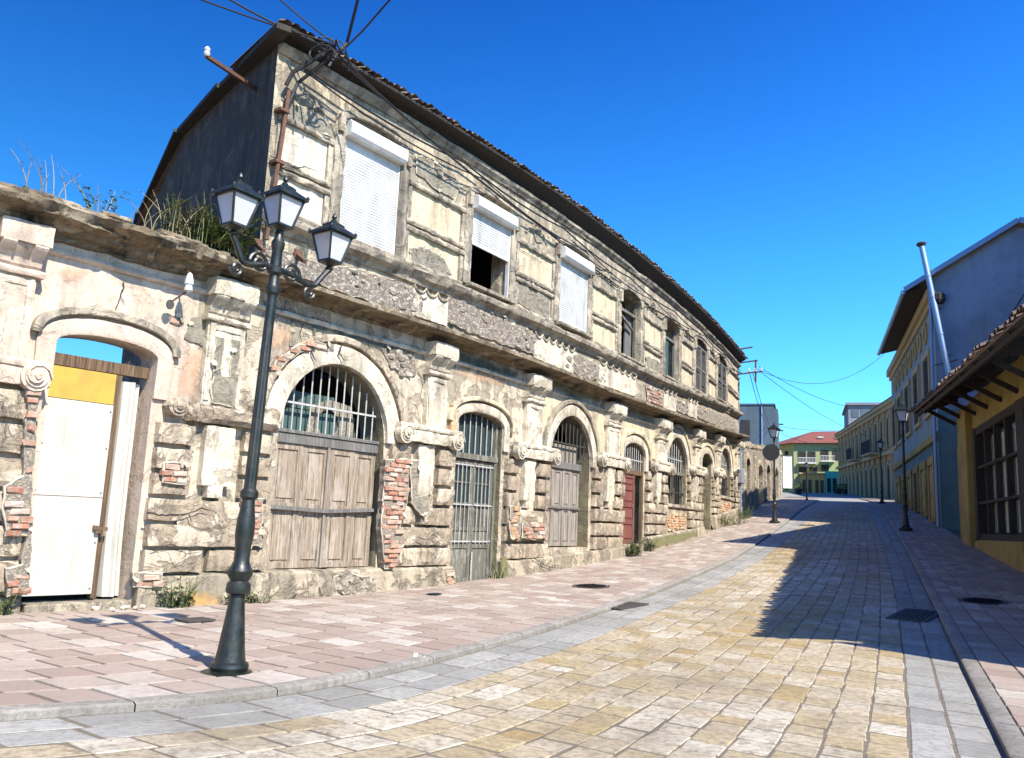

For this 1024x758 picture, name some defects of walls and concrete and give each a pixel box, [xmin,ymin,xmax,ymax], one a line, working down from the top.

spalling [269,327,335,375]
spalling [158,459,189,485]
spalling [1,389,42,598]
spalling [333,458,432,595]
spalling [504,505,547,540]
spalling [663,512,687,531]
spalling [129,571,164,588]